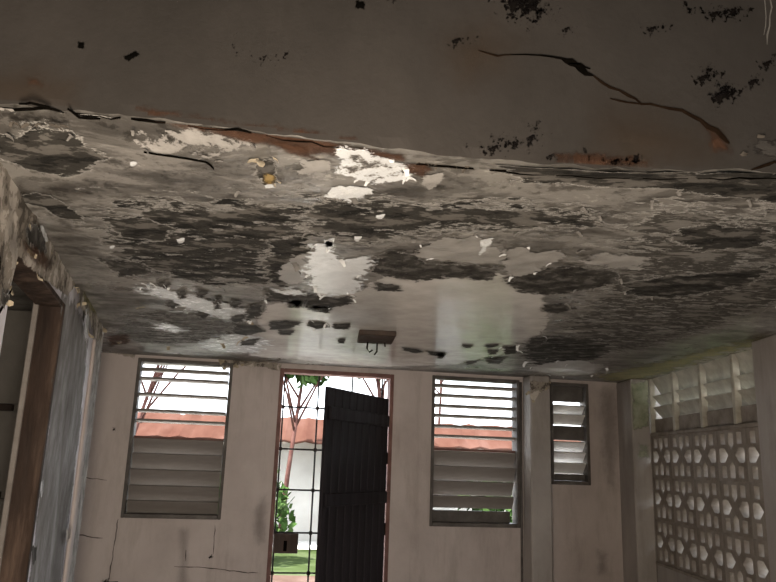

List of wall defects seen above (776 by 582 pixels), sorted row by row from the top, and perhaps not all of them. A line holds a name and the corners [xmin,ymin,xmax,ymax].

water stain [494,0,561,29]
water stain [683,1,755,23]
crack [479,50,730,144]
water stain [691,54,776,108]
crack [751,161,776,170]
peeling [0,118,776,582]
crack [79,520,118,582]